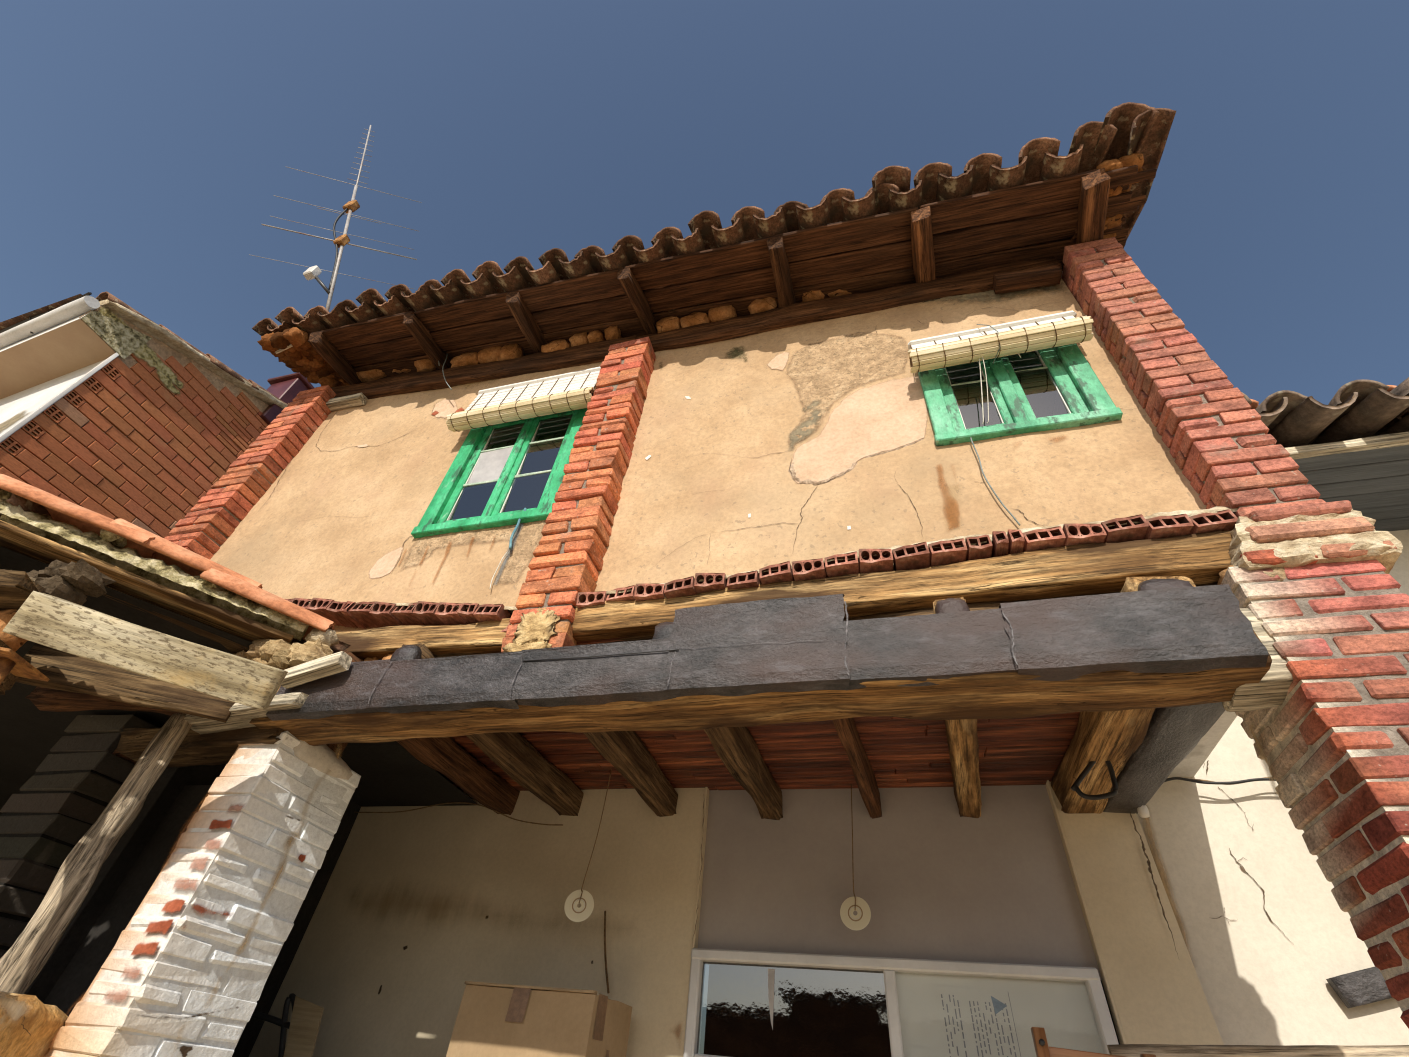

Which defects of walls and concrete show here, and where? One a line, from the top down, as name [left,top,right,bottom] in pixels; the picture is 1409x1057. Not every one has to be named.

peeling [767,333,927,486]
spalling [369,520,545,584]
crack [1130,812,1179,958]
crack [1203,760,1291,942]